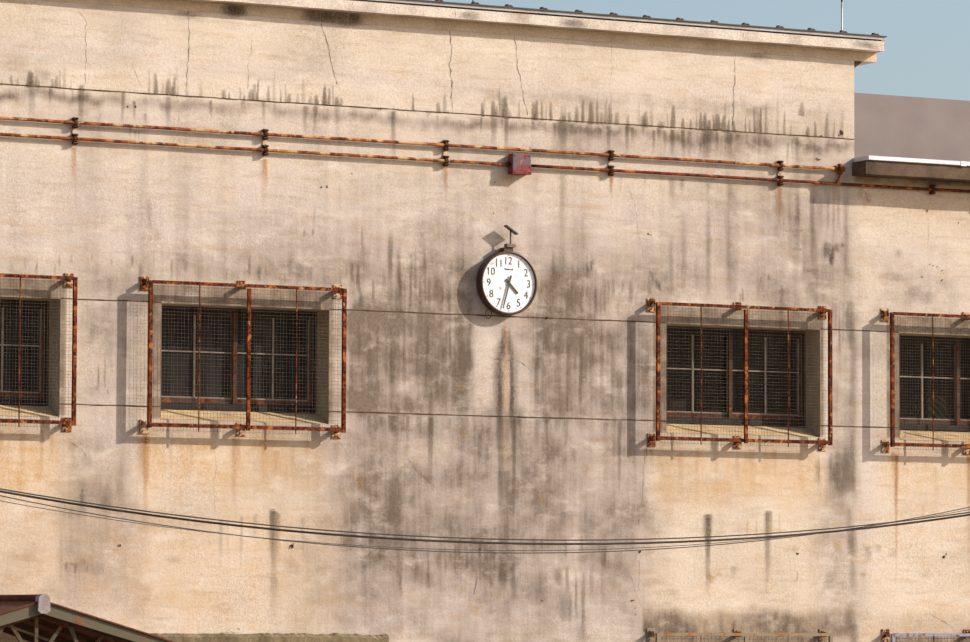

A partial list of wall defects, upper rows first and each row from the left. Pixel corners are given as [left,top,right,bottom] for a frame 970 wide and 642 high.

water stain [533,104,612,126]
water stain [699,119,735,134]
water stain [499,335,517,424]